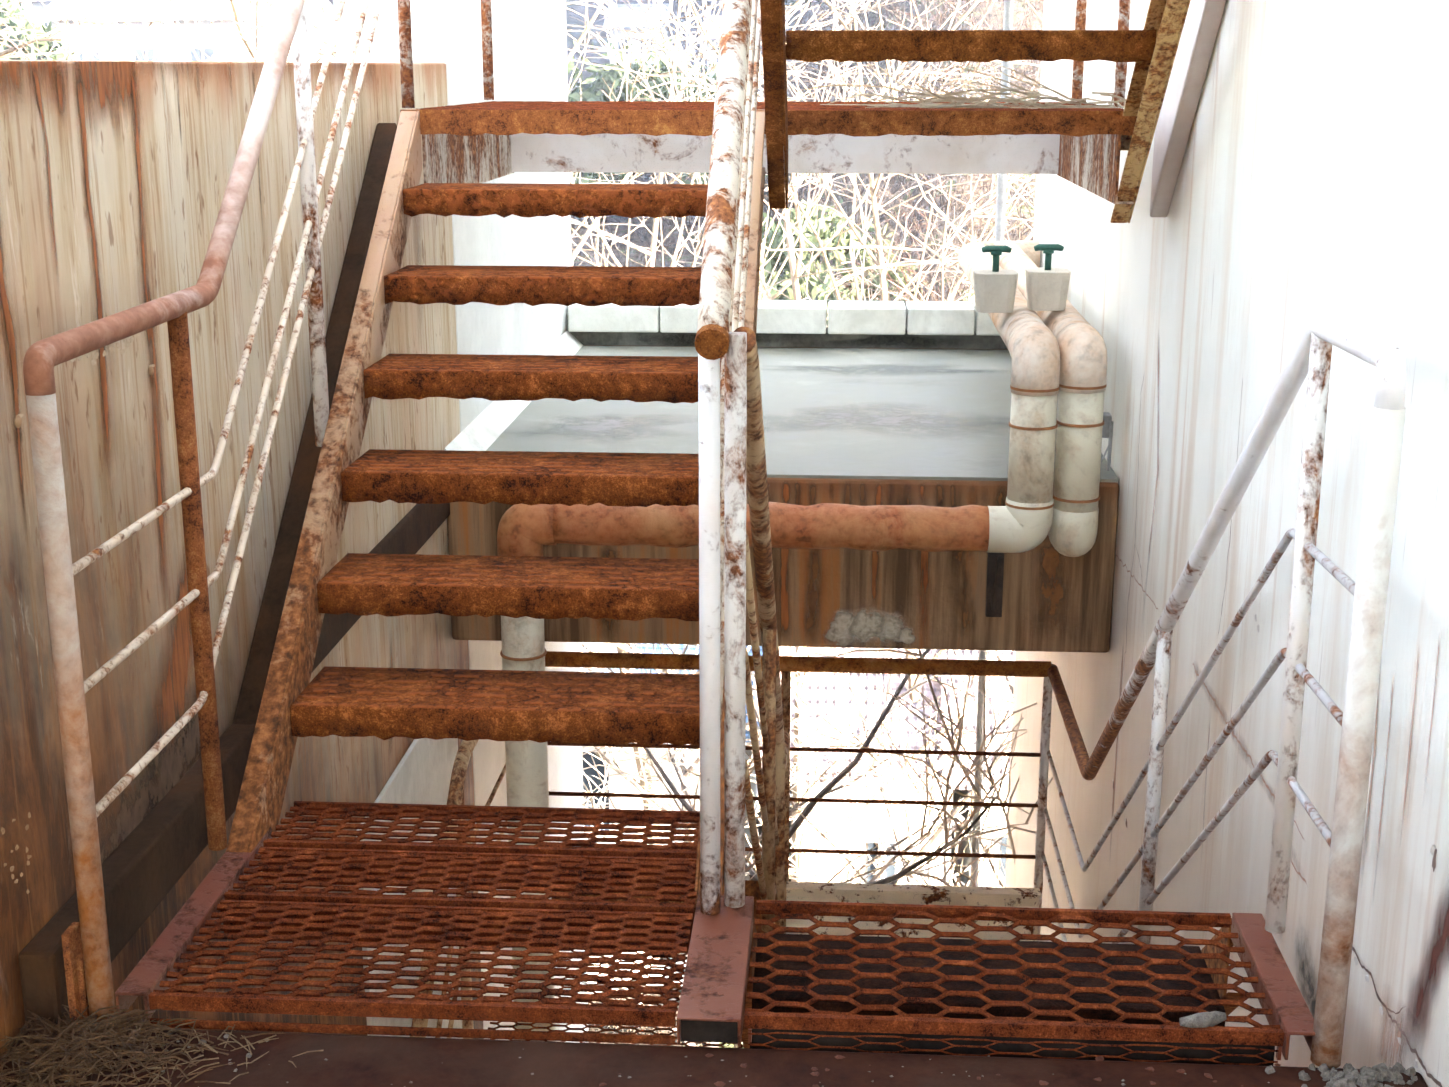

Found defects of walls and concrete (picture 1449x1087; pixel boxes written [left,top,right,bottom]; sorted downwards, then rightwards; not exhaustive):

corrosion [0,61,151,320]
corrosion [0,232,23,498]
corrosion [99,347,109,452]
corrosion [147,327,192,738]